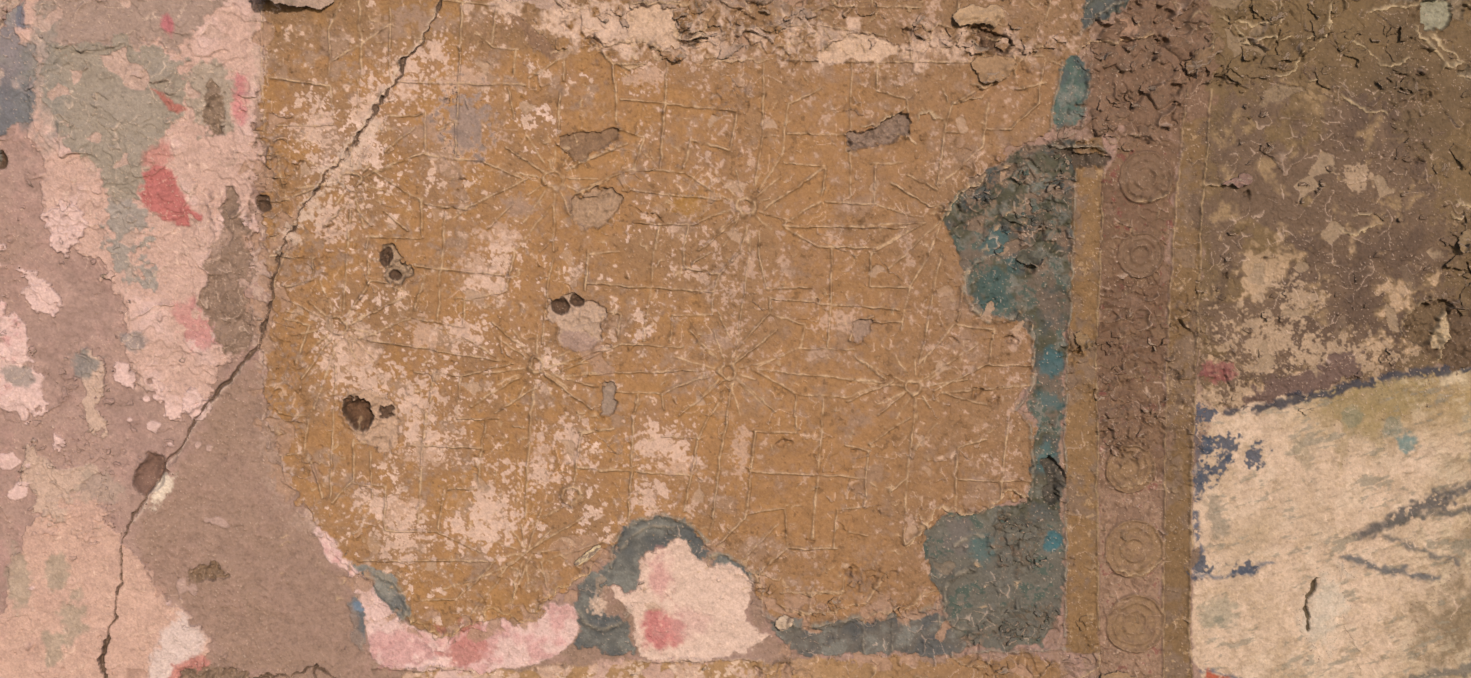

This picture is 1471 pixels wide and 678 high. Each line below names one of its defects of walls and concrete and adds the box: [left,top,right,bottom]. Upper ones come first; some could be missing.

spalling [502,0,573,61]
peeling [595,0,836,76]
peeling [815,0,1198,255]
crack [167,0,442,462]
peeling [1133,0,1471,416]
peeling [0,0,334,678]
spalling [341,388,401,455]
crack [97,494,149,678]
crack [254,663,341,678]
peeling [313,527,941,677]
peeling [905,455,1067,569]